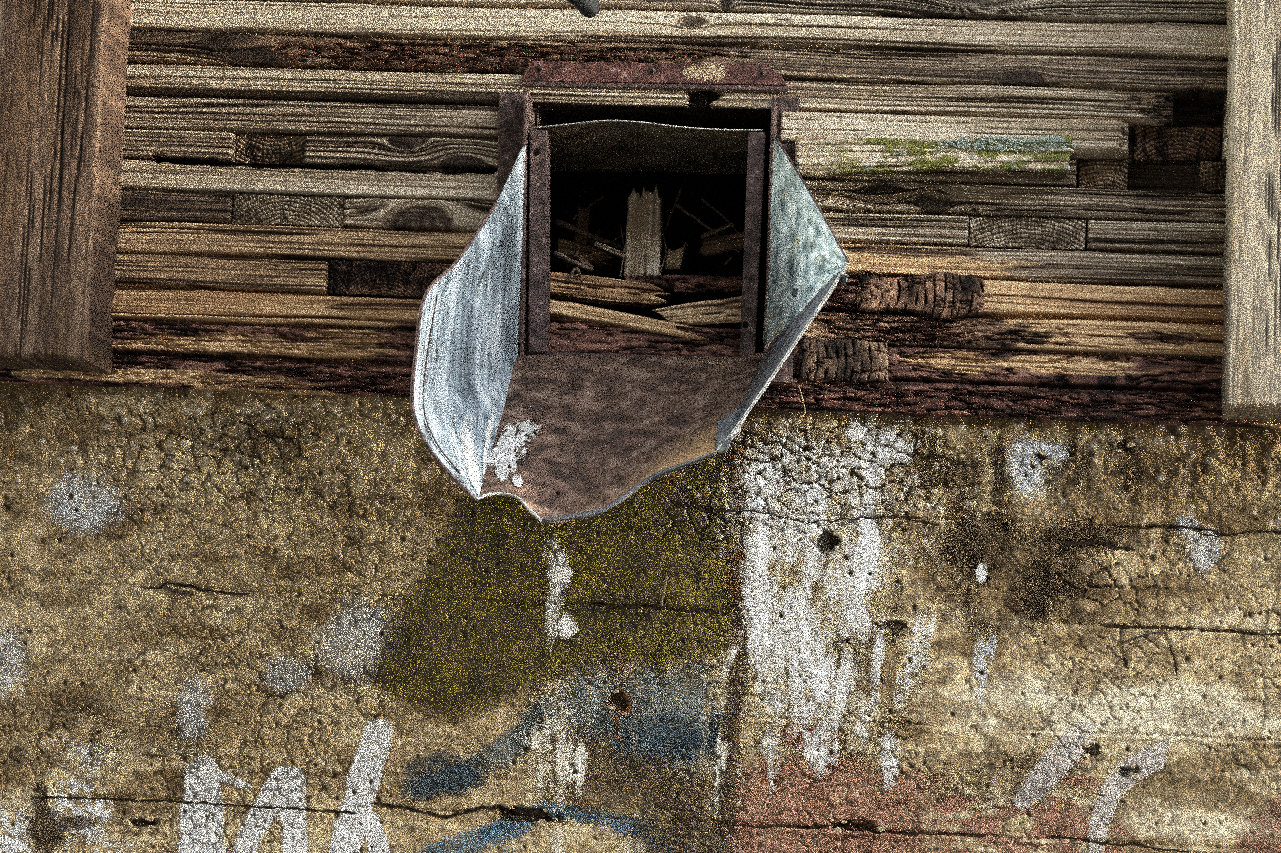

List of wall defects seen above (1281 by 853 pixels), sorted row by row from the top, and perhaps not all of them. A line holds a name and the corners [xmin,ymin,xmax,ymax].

damp [531,424,905,853]
damp [906,624,933,687]
crack [1100,625,1281,680]
crack [28,781,556,821]